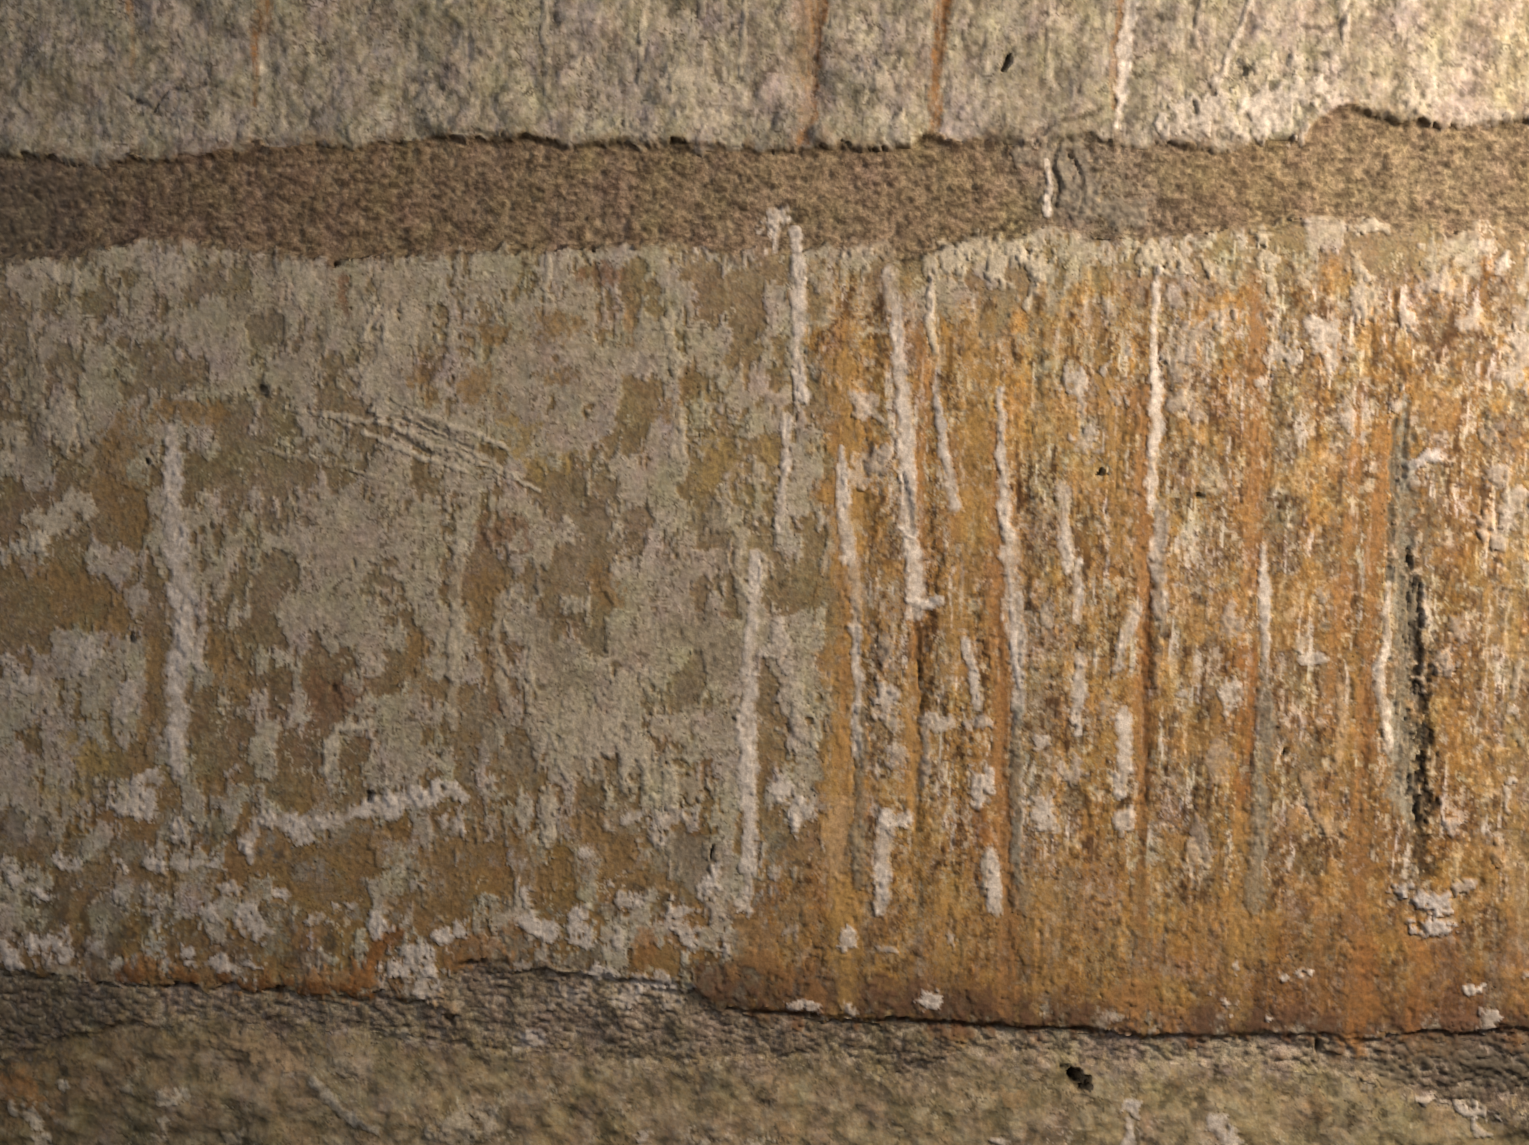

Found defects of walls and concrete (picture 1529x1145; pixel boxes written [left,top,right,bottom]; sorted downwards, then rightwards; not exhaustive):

corrosion [245,0,276,112]
corrosion [784,0,833,148]
corrosion [925,0,956,135]
leakage [1249,214,1421,400]
leakage [486,123,1239,962]
leakage [98,420,496,975]
corrosion [685,236,1529,1066]
leakage [1200,542,1352,917]
efflorescence [302,900,470,1002]
leakage [509,875,697,1015]
leakage [782,997,860,1024]
efflorescence [1385,878,1479,941]